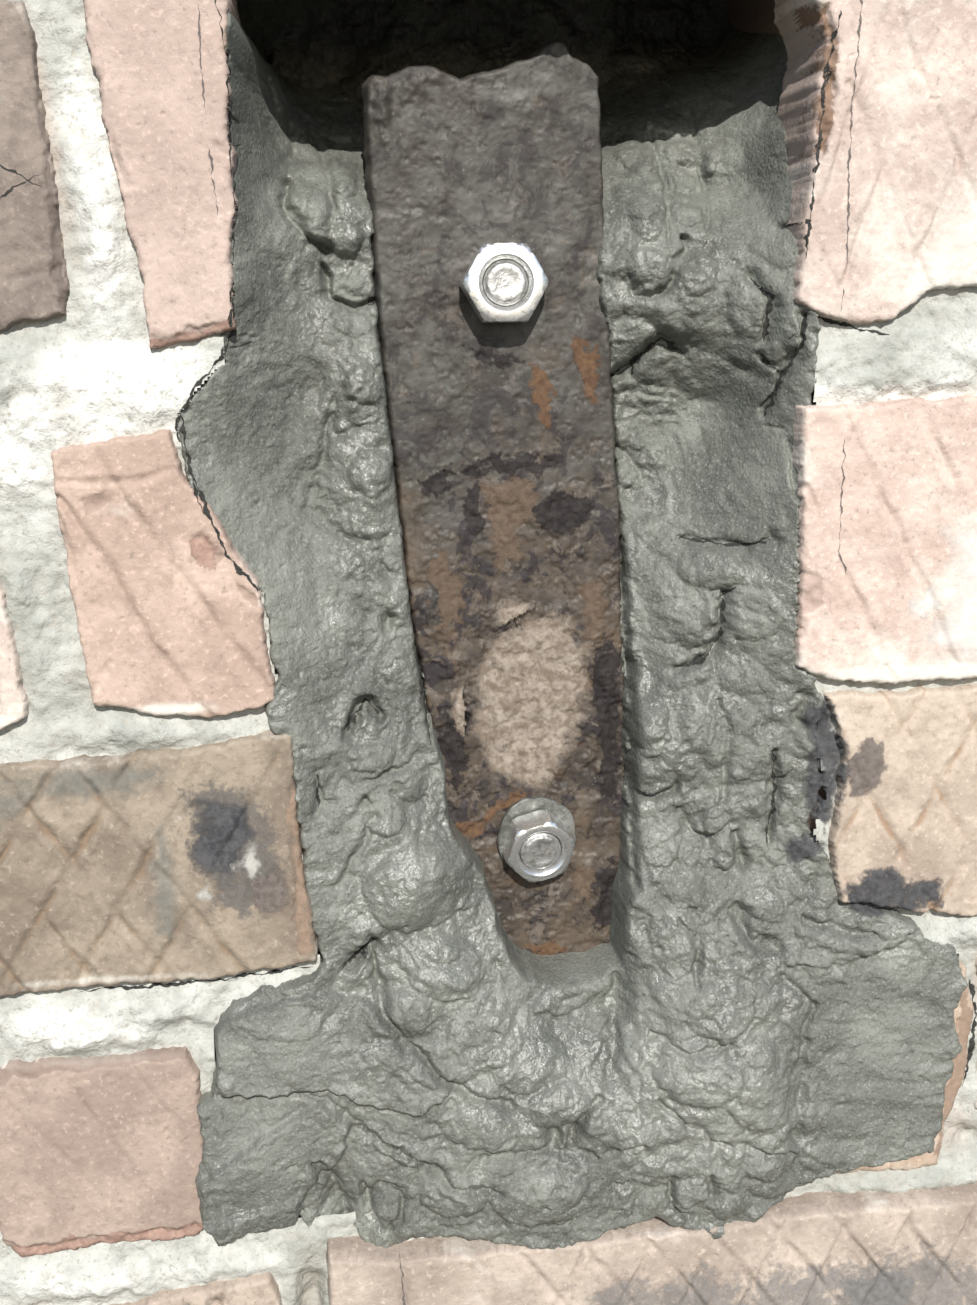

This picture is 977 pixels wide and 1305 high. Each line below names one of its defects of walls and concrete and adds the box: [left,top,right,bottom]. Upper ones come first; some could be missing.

crack [750,0,889,416]
corrosion [528,363,557,429]
corrosion [570,335,602,407]
corrosion [479,474,541,574]
crack [678,537,770,546]
corrosion [425,549,466,630]
crack [680,587,736,667]
corrosion [454,790,530,838]
crack [765,751,793,842]